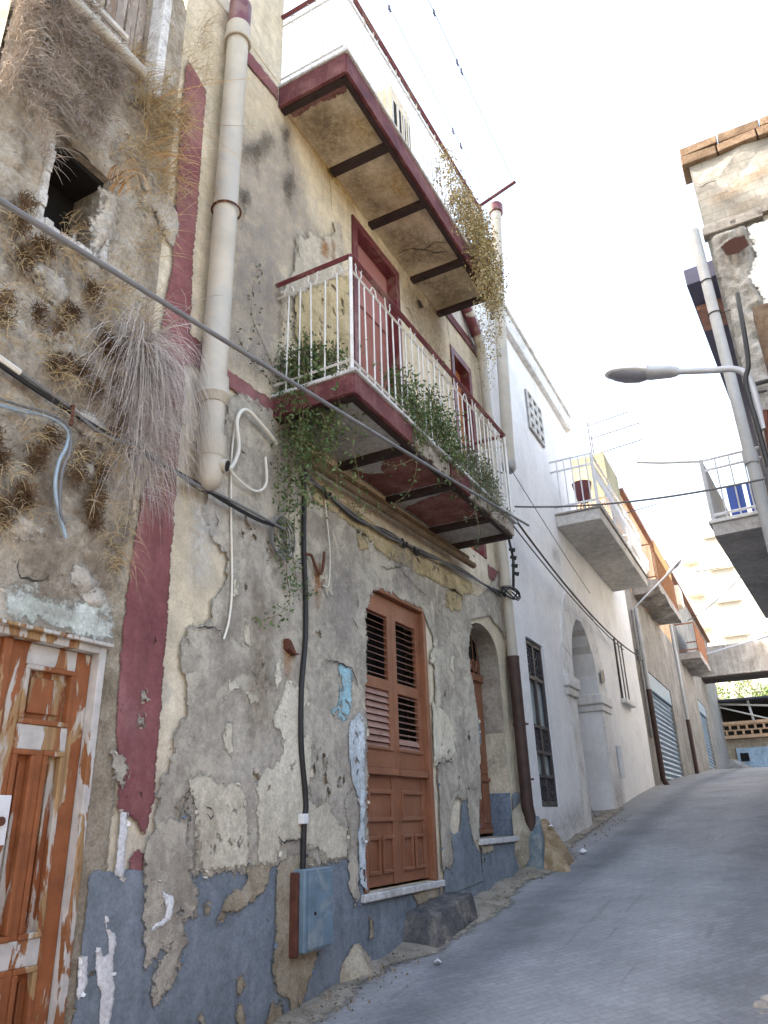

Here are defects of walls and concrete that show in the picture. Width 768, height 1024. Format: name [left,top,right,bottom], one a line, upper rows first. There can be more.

crack [397,242,447,254]
flaking render [711,220,768,410]
spalling [469,486,515,536]
flaking render [70,563,106,608]
flaking render [136,690,151,729]
flaking render [141,392,506,1024]
flaking render [109,749,130,790]
flaking render [114,809,130,883]
flaking render [76,914,117,1024]